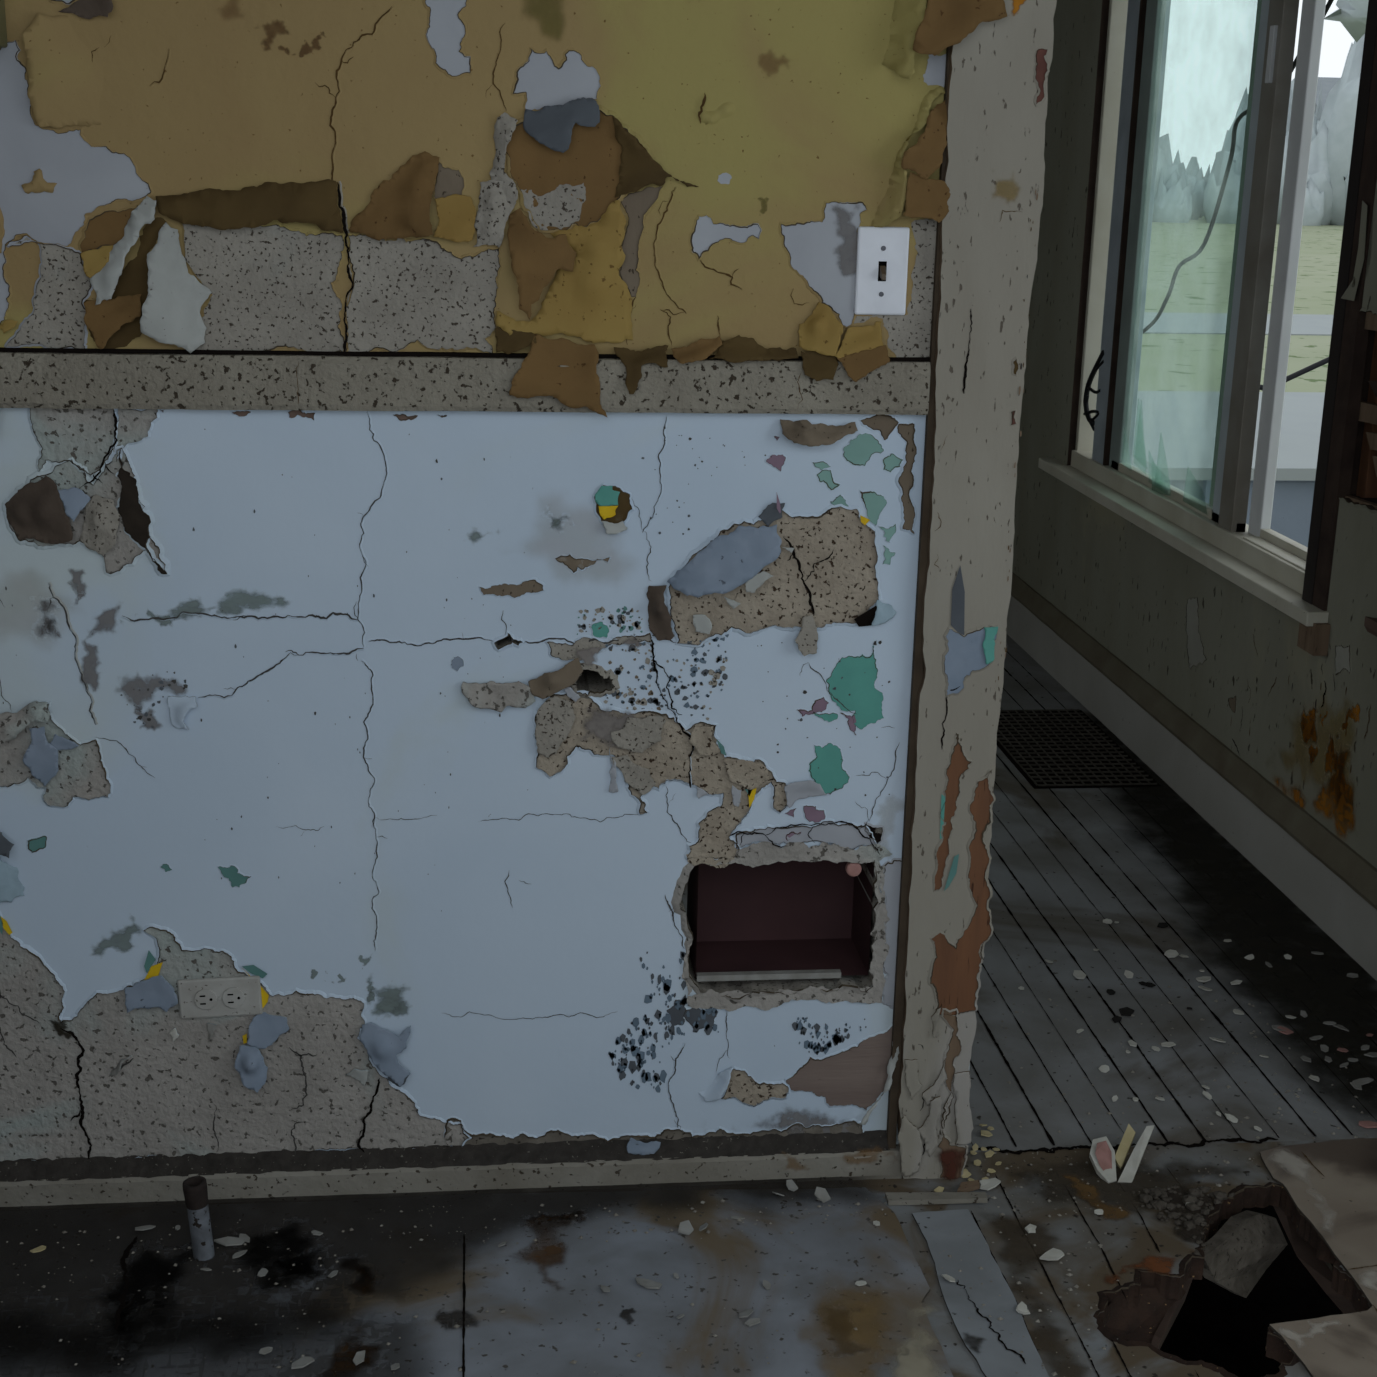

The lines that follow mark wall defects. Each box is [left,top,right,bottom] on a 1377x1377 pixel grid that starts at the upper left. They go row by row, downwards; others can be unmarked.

peeling [511,47,603,111]
peeling [0,0,154,325]
peeling [689,199,937,357]
crack [79,410,118,489]
peeling [115,450,167,574]
crack [783,537,833,616]
crack [122,411,694,951]
spalling [532,606,884,860]
crack [729,663,899,854]
rust [1276,704,1360,836]
peeling [897,732,1002,1192]
crack [0,993,133,1159]